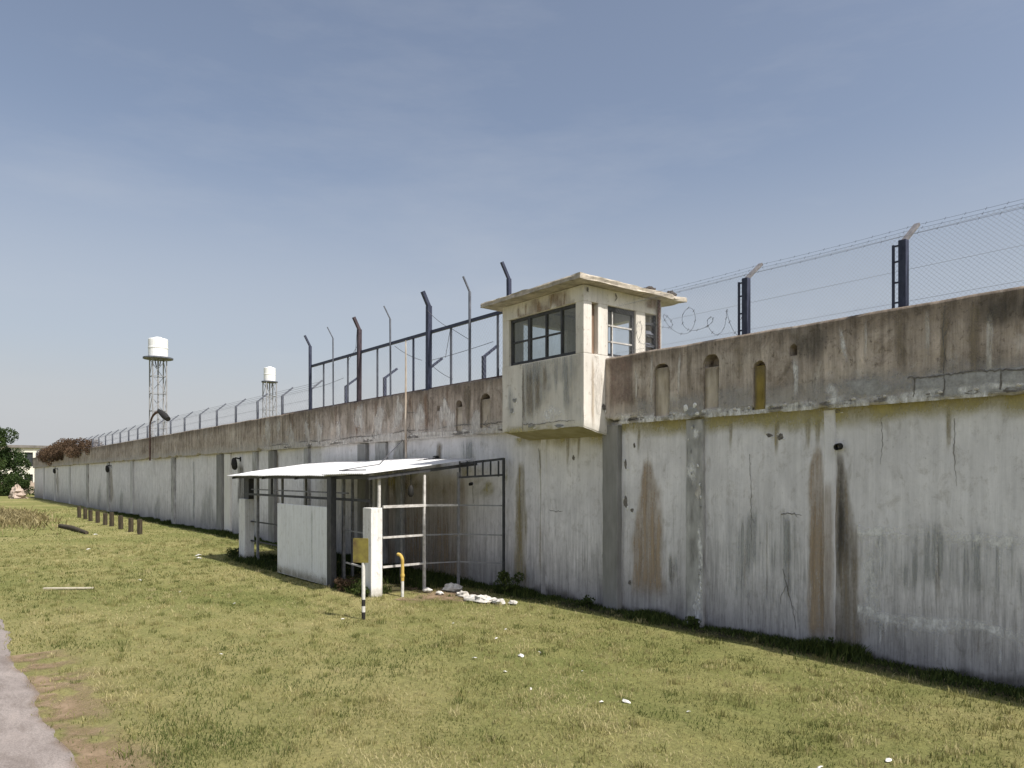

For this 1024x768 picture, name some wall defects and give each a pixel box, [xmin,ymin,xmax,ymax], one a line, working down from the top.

leakage [887,391,938,404]
leakage [958,383,1023,398]
leakage [619,413,688,424]
leakage [702,406,768,417]
leakage [810,458,1023,644]
crack [780,571,796,628]